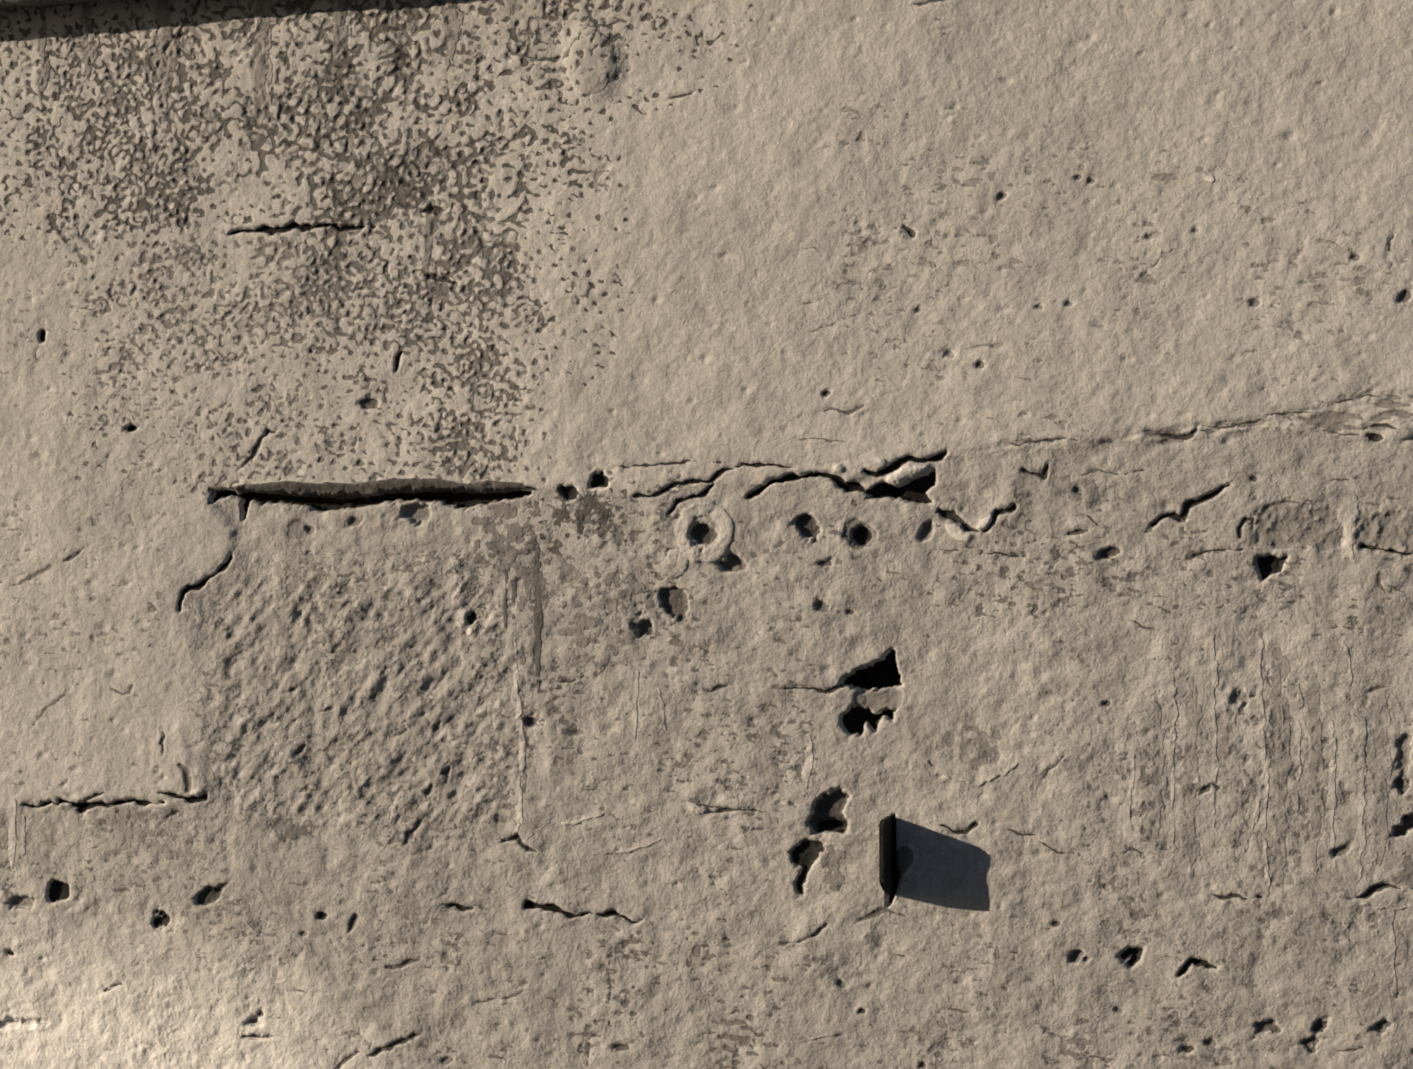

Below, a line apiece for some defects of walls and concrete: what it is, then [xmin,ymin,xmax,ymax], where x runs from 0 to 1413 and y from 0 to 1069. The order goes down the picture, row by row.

crack [619,404,947,514]
crack [939,394,1413,612]
crack [147,555,233,612]
spalling [854,688,901,711]
crack [23,731,207,835]
leakage [1127,633,1219,878]
leakage [1243,631,1336,897]
leakage [1357,684,1413,887]
crack [447,903,473,911]
crack [473,982,527,1005]
crack [495,900,639,1066]